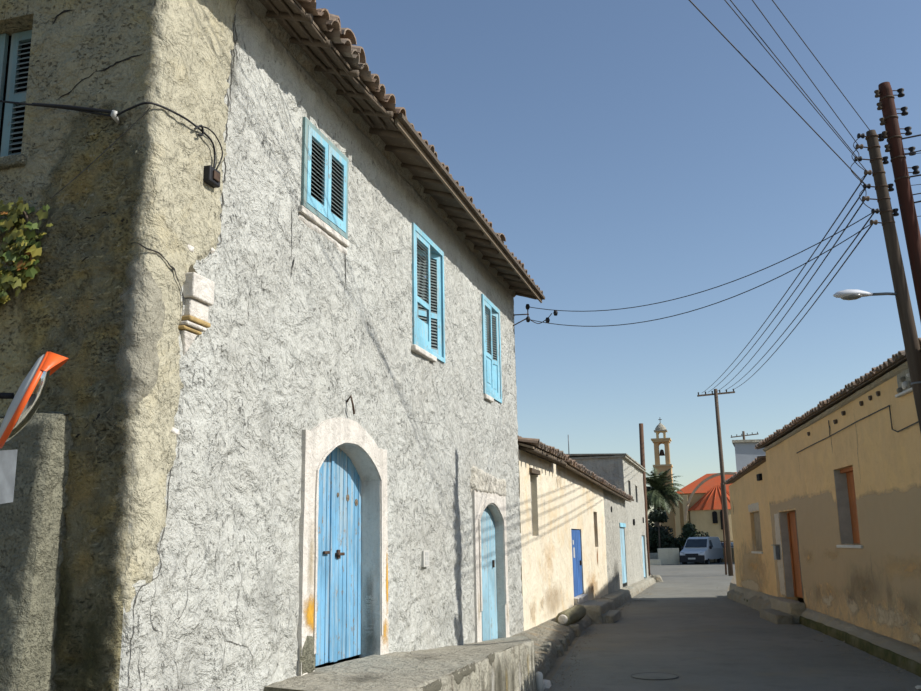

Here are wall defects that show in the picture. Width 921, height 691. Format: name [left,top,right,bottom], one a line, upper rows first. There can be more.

crack [208,0,292,257]
crack [127,466,198,690]
damp [770,487,921,649]